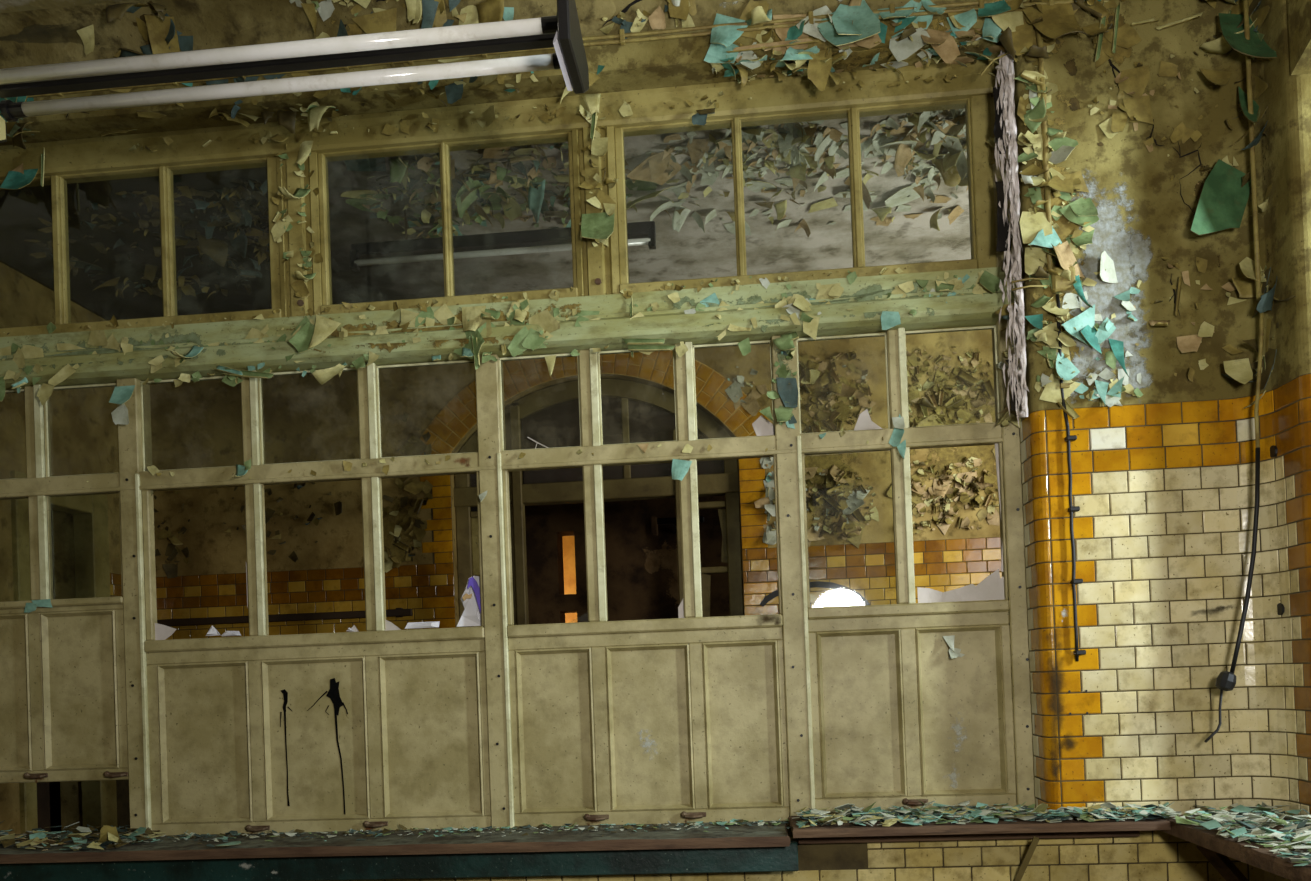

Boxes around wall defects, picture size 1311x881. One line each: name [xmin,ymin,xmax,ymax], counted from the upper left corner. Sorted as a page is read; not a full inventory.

spalling [0,0,1296,578]